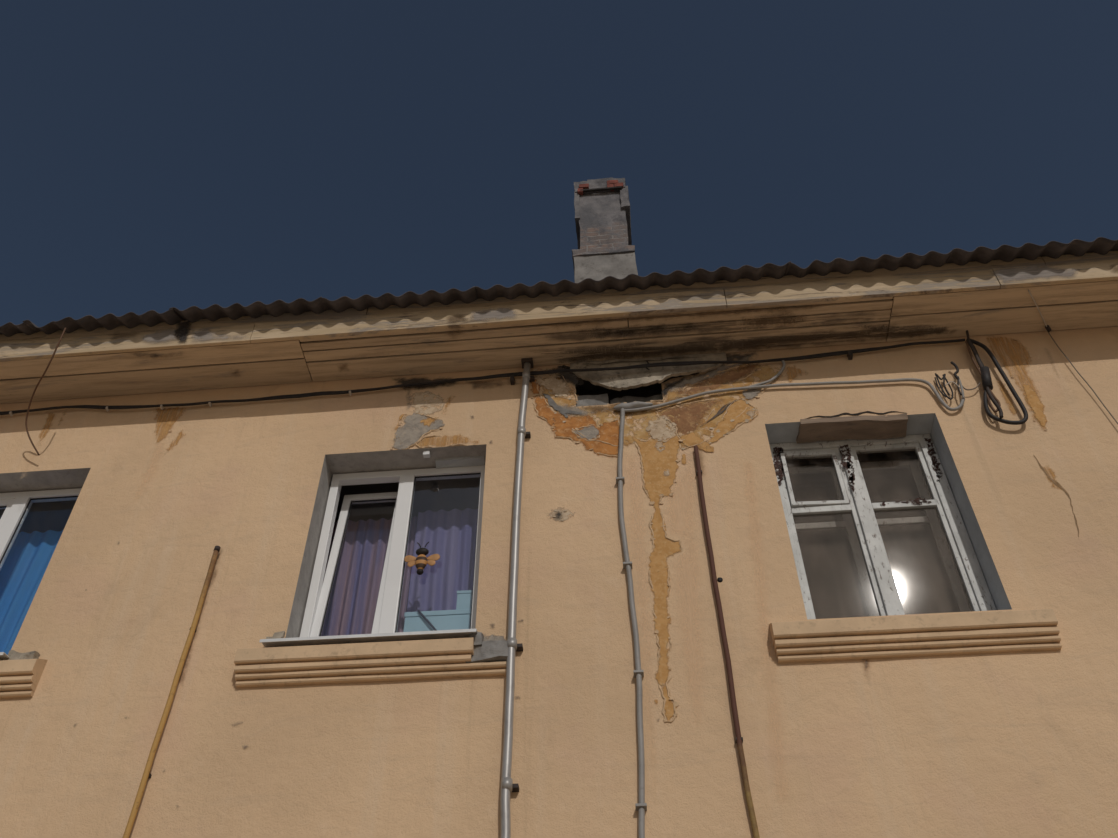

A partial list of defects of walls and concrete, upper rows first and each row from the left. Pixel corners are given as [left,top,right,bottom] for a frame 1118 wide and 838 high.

damp [546,307,946,385]
peeling [153,407,186,451]
peeling [390,398,491,450]
crack [1034,456,1079,537]
peeling [531,355,802,723]